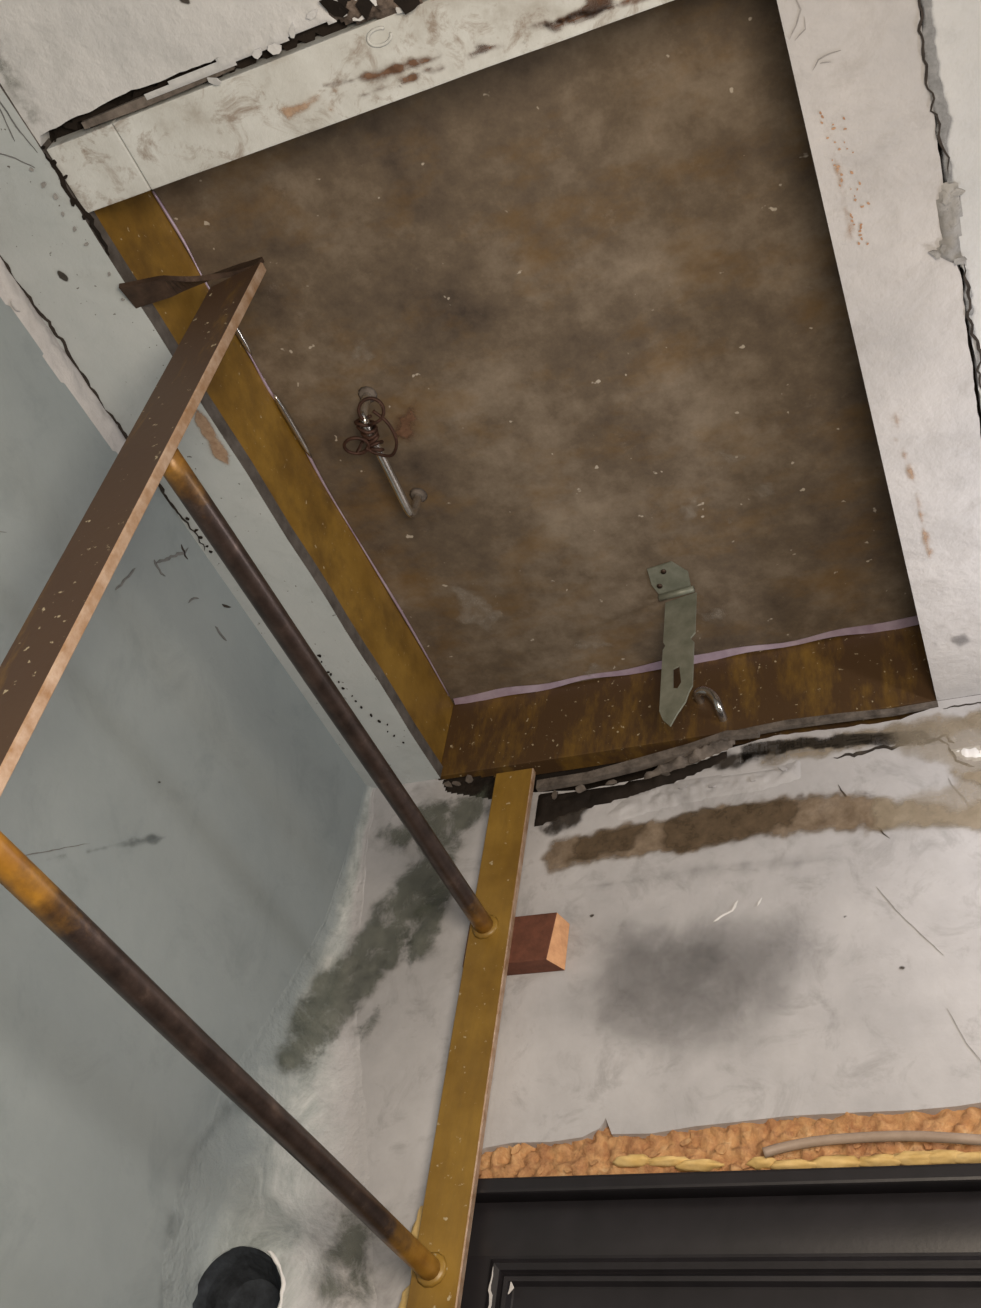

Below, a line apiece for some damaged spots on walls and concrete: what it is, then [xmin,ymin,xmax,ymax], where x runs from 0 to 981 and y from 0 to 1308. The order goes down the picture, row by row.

flaking render [144,0,423,100]
corrosion [281,98,316,118]
corrosion [360,58,432,83]
crack [917,0,952,210]
crack [948,260,981,388]
flaking render [608,739,801,820]
leakage [713,712,981,769]
crack [834,702,981,807]
leakage [418,791,484,859]
leakage [542,793,981,872]
leakage [280,858,450,1069]